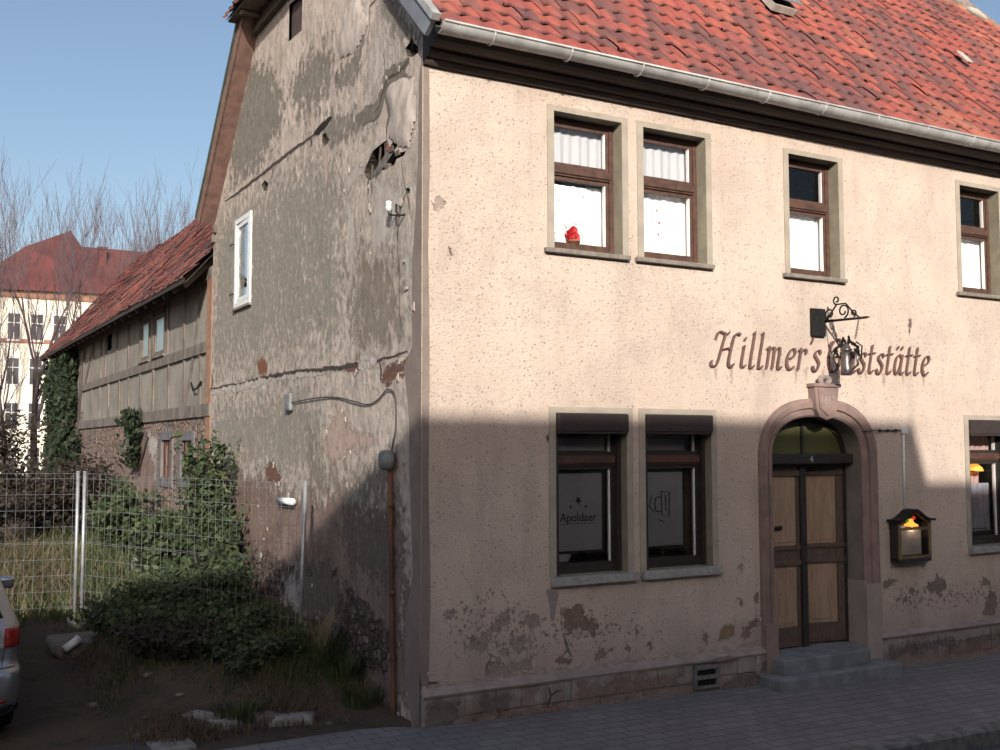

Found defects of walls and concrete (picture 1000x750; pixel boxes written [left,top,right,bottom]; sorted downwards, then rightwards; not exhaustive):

crack [224,0,411,202]
peeling [363,6,418,106]
peeling [364,140,406,265]
crack [210,160,409,399]
peeling [402,249,415,318]
flaking render [381,357,407,388]
flaking render [219,462,410,716]
spalling [470,590,599,678]
spalling [902,561,947,603]
spalling [982,577,998,615]